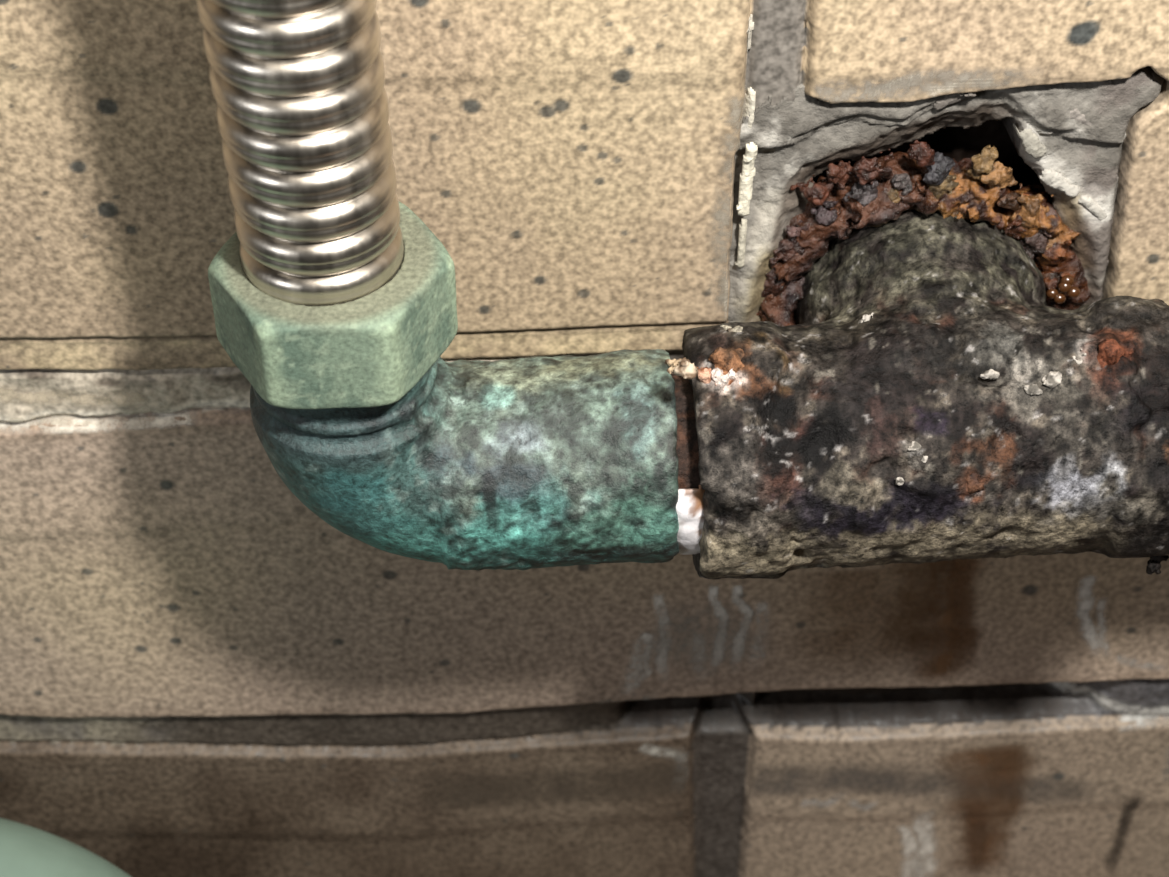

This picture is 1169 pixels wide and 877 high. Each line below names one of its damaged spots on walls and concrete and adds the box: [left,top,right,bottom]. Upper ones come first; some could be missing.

spalling [728,66,1164,323]
damp [628,586,766,689]
damp [1077,577,1105,648]
damp [1051,682,1169,725]